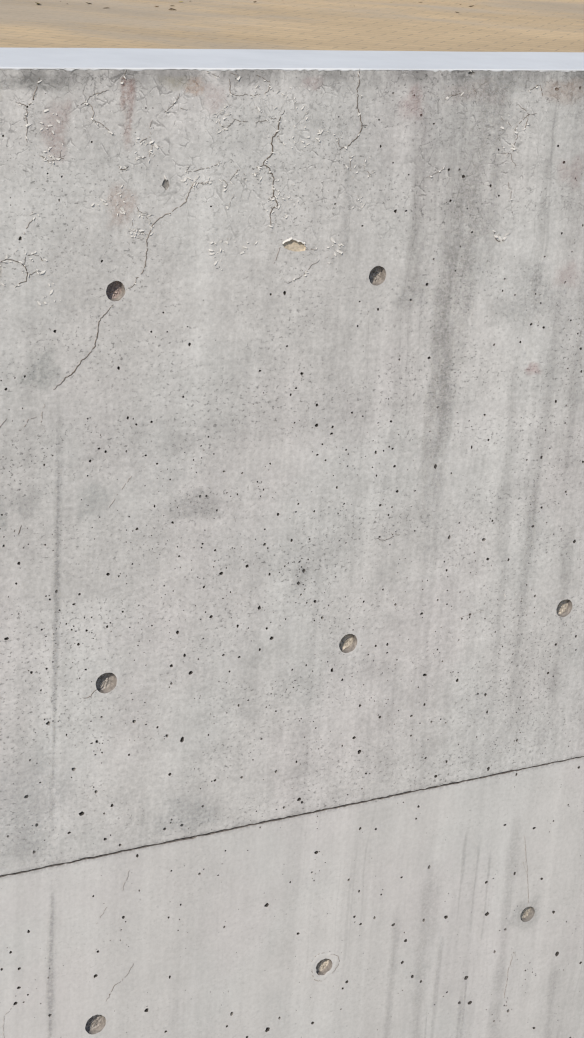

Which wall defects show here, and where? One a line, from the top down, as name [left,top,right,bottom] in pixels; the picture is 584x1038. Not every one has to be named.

crack [338,70,371,176]
crack [490,85,543,200]
crack [0,71,317,427]
peeling [282,237,307,251]